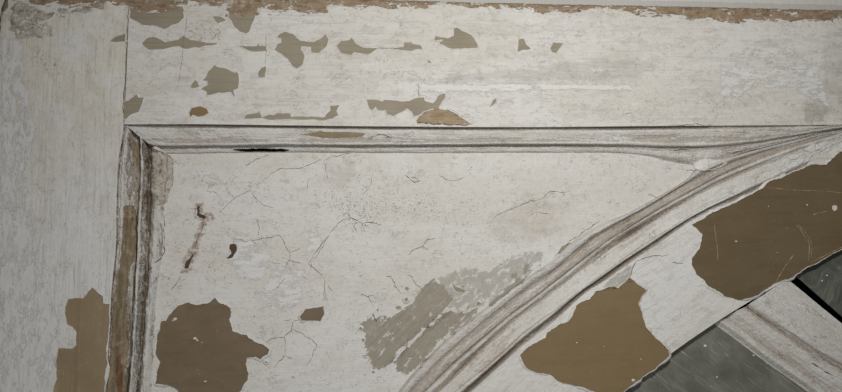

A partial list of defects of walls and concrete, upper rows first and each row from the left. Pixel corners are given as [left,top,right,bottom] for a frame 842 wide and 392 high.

peeling [130,6,217,50]
peeling [191,65,241,98]
peeling [238,32,377,69]
peeling [367,93,447,118]
peeling [434,27,479,50]
crack [249,153,349,189]
crack [136,215,180,290]
crack [233,214,380,296]
peeling [691,143,842,301]
peeling [53,204,137,392]
peeling [153,297,273,392]
peeling [518,277,671,392]